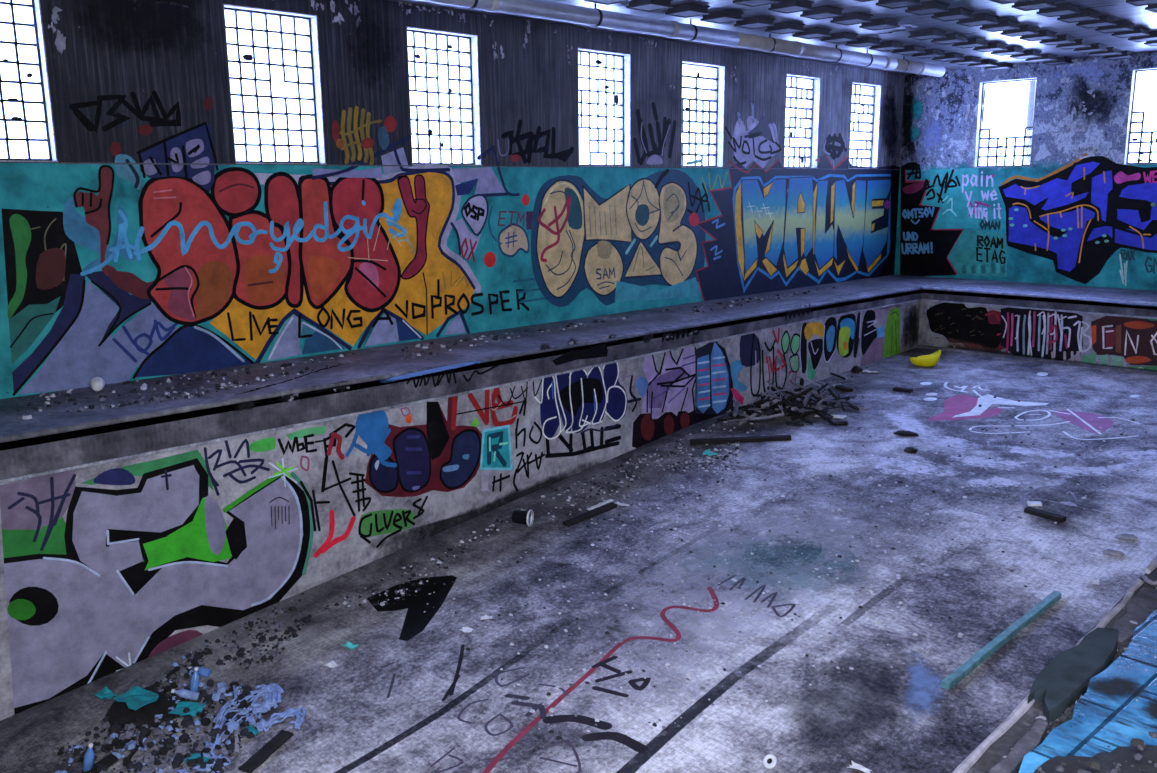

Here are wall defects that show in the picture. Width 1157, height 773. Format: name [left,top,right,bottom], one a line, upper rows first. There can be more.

leakage [1054,62,1107,83]
leakage [883,80,941,159]